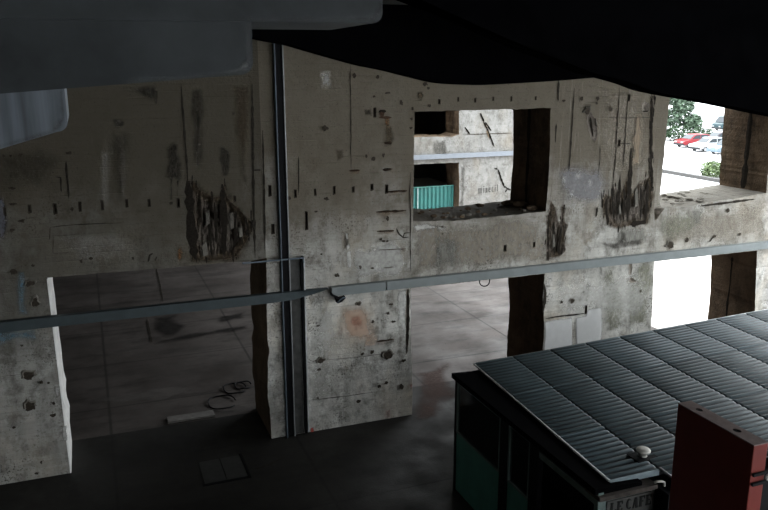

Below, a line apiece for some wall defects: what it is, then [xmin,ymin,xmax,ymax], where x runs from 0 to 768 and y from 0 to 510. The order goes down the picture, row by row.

spalling [601,94,664,232]
spalling [184,175,253,263]
spalling [545,201,568,261]